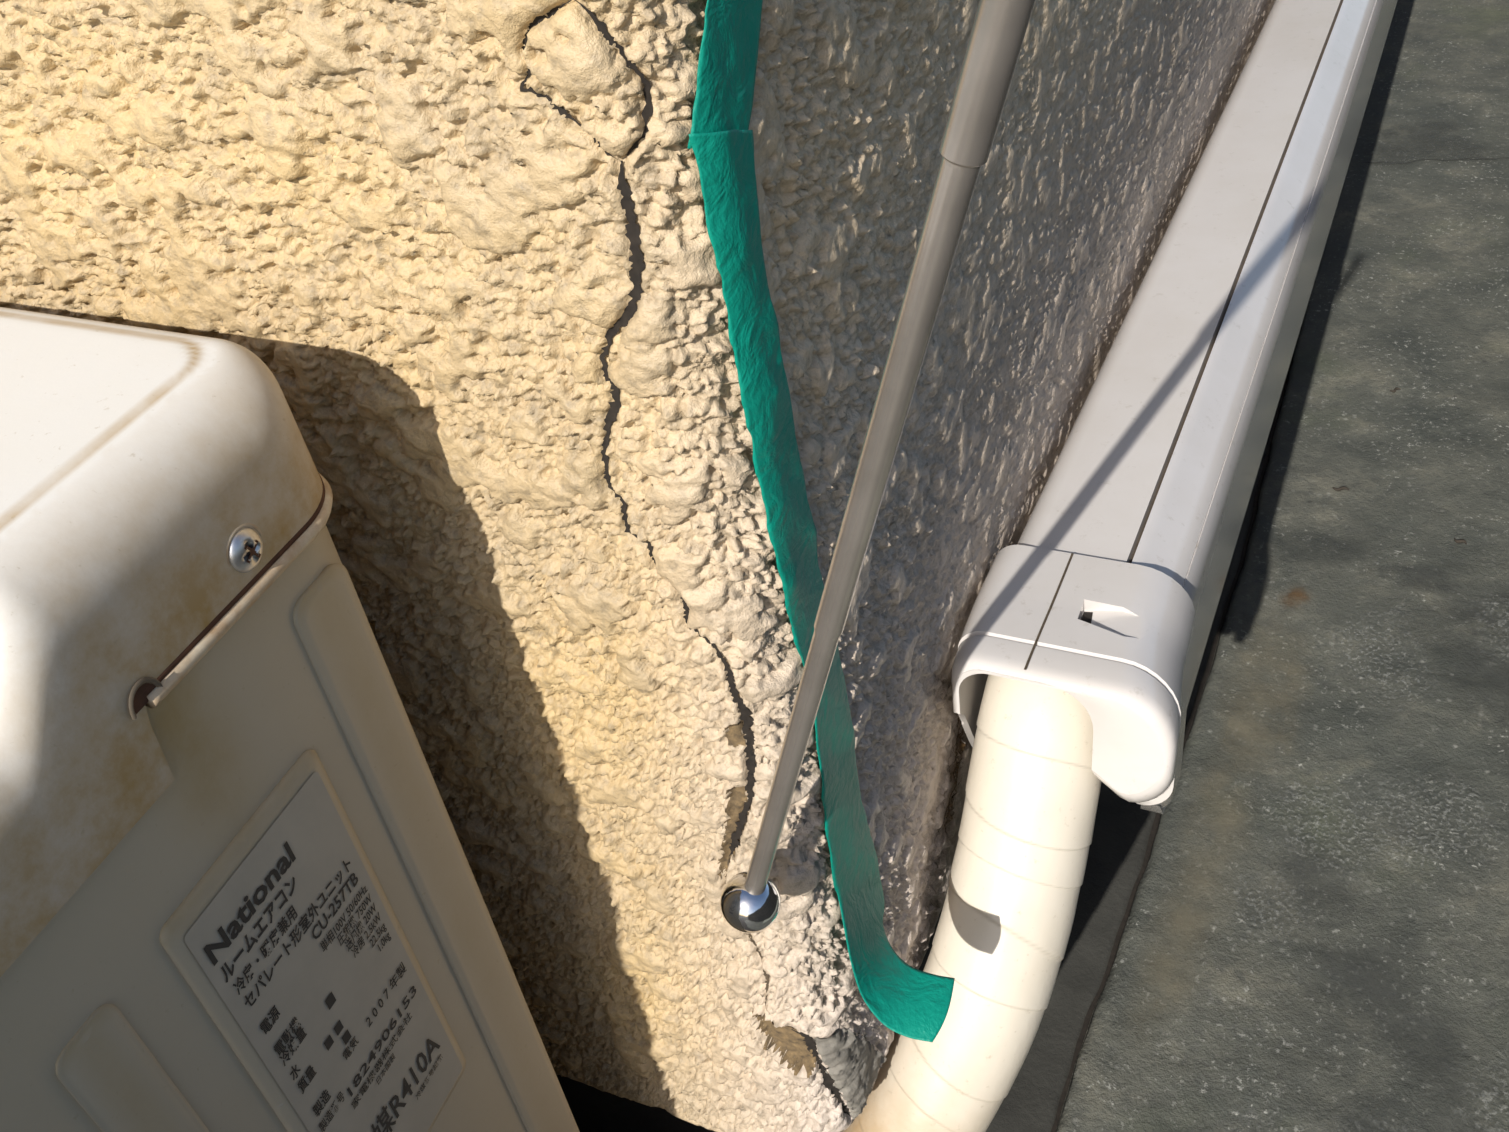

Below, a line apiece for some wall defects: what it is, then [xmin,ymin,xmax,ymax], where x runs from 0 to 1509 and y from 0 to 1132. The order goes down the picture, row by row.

crack [520,0,656,565]
crack [680,597,756,881]
crack [747,933,850,1116]